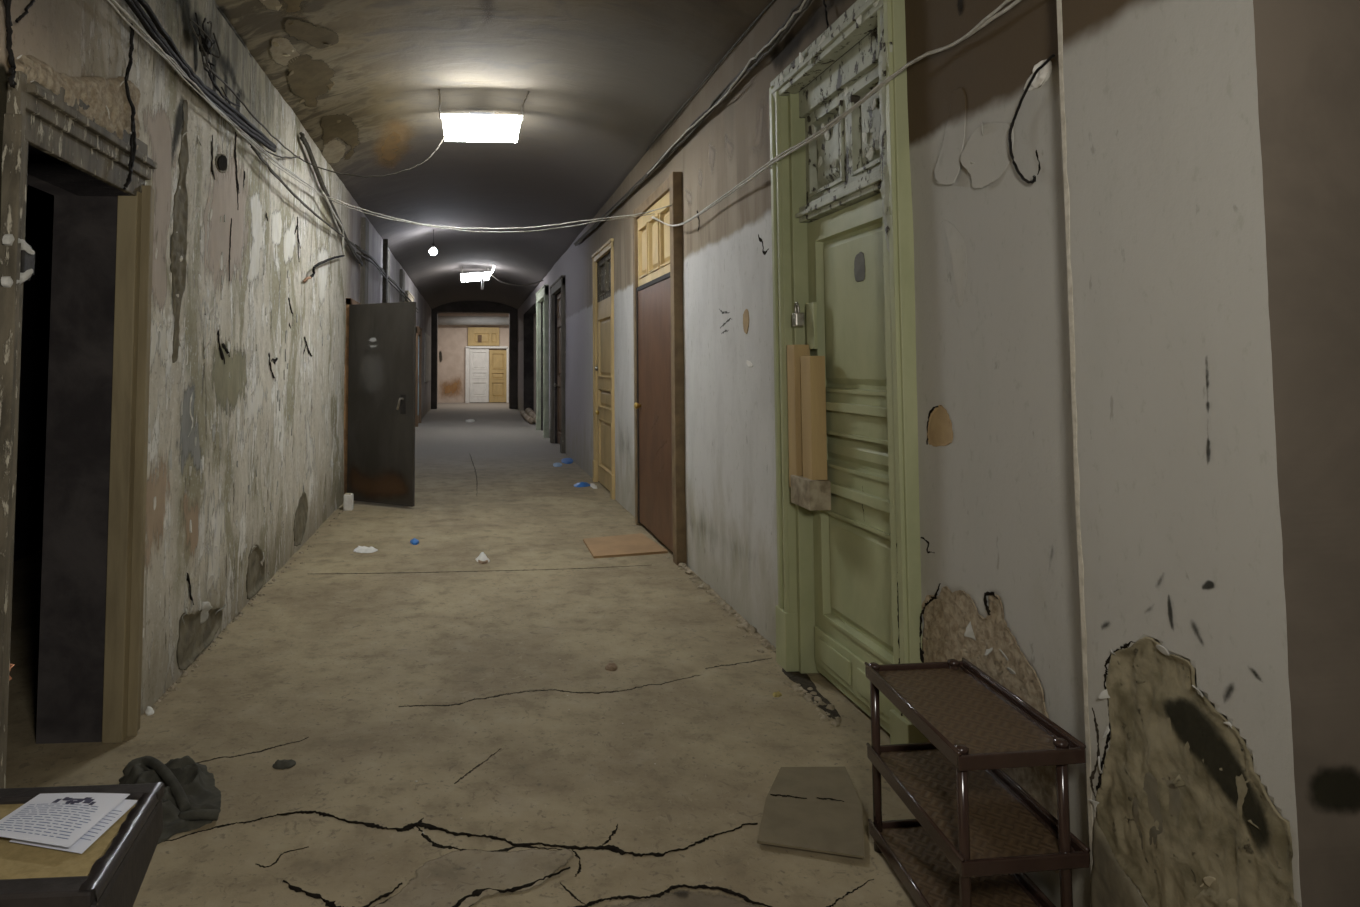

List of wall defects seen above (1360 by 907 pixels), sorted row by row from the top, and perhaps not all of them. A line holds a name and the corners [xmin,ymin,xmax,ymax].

peeling [259,0,360,163]
flaking render [7,55,296,371]
peeling [318,246,336,346]
flaking render [145,314,309,670]
flaking render [293,473,313,546]
crack [399,658,771,707]
flaking render [919,583,1049,718]
flaking render [1088,637,1298,907]
crack [164,810,772,907]
crack [826,879,874,907]